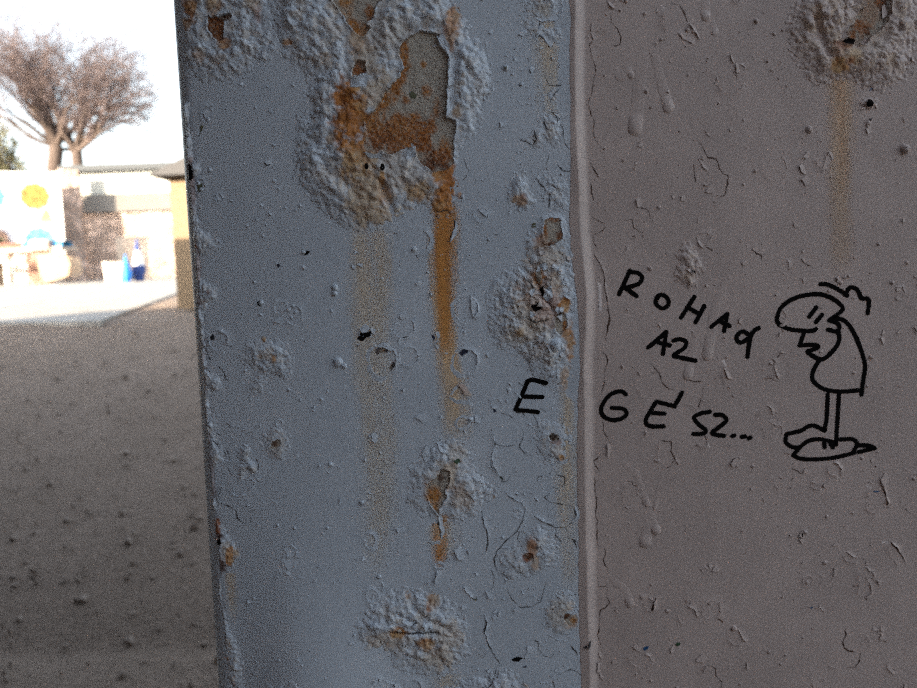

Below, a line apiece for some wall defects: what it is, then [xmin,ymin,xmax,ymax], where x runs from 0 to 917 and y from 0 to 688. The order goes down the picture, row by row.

corrosion [431,209,460,422]
crack [475,408,611,688]